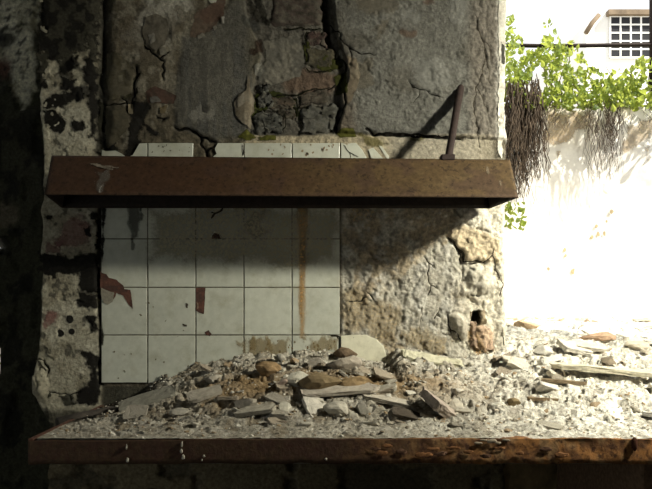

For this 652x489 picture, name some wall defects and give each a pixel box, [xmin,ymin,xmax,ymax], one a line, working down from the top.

crack [145,47,169,80]
spalling [234,0,361,135]
crack [327,25,373,158]
crack [365,127,461,140]
water stain [128,208,142,250]
spalling [100,272,133,309]
spalling [196,288,205,314]
spalling [470,310,494,351]